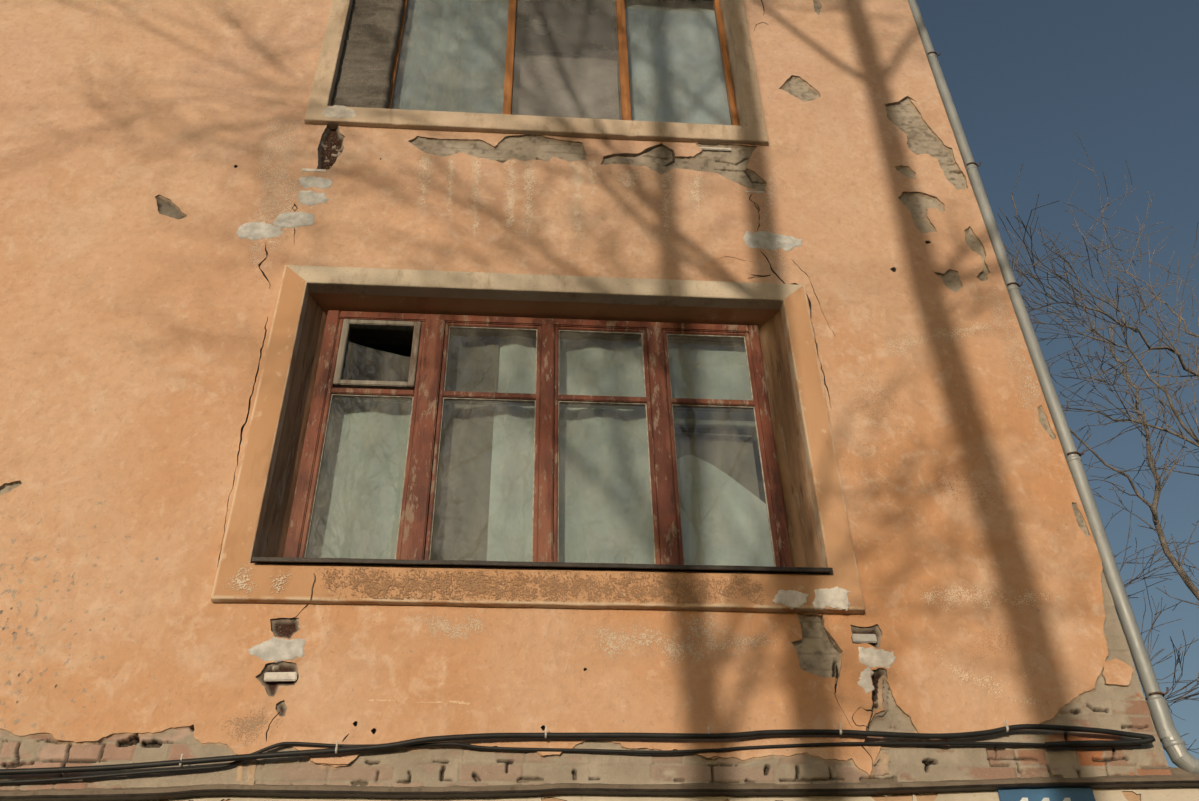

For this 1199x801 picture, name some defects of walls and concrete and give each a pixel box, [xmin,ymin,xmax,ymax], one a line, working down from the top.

peeling [0,482,22,495]
spalling [1072,503,1090,537]
flaking render [0,570,1172,801]